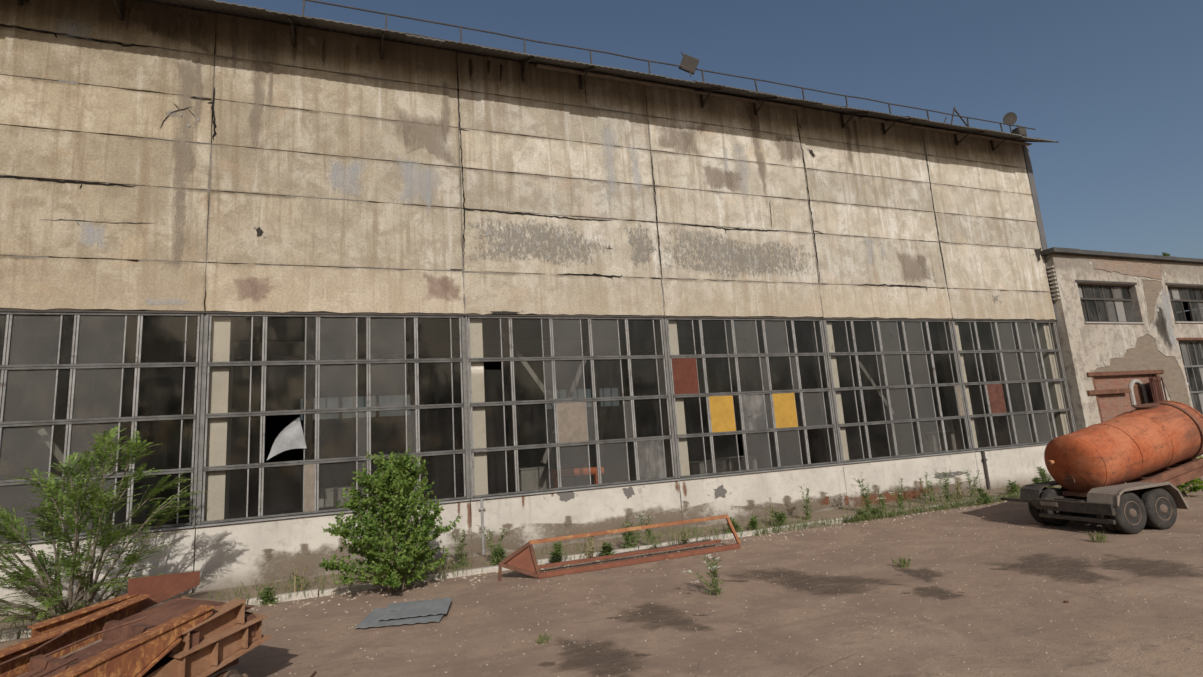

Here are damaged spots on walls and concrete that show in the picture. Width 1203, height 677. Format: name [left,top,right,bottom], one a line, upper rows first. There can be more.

crack [0,24,159,48]
damp [127,2,207,258]
crack [160,87,217,140]
damp [400,84,450,160]
crack [0,175,136,188]
crack [40,217,142,225]
spalling [1089,257,1191,406]